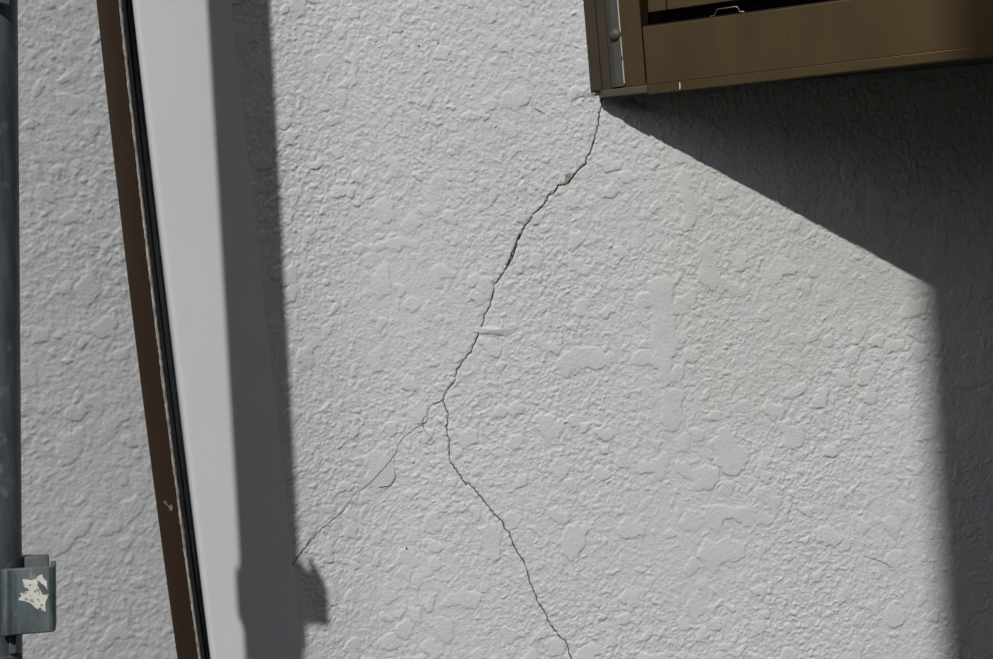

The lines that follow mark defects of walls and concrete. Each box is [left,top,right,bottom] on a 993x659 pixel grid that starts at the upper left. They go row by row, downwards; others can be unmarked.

crack [293,98,604,659]